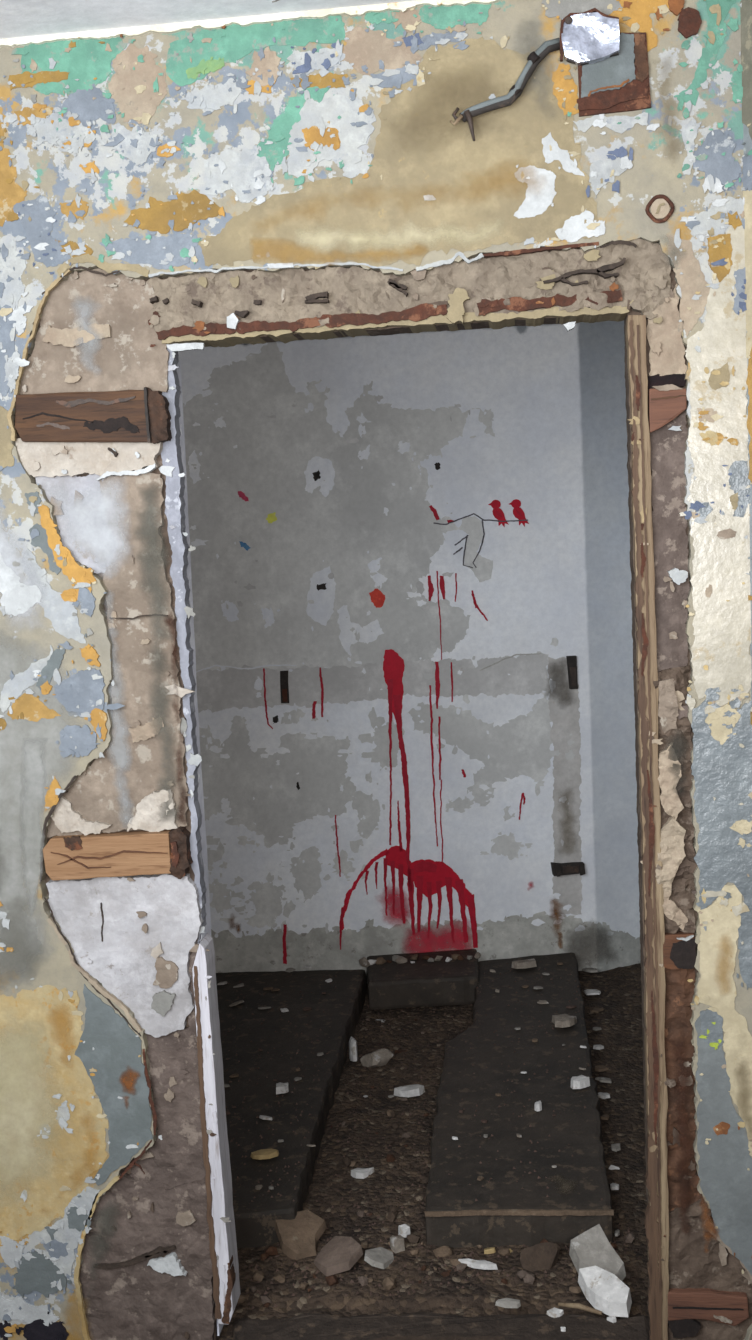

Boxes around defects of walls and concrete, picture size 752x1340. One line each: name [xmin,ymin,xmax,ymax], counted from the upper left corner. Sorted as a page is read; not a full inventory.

peeling [7,34,181,166]
peeling [607,0,702,52]
peeling [674,0,752,140]
peeling [0,115,93,269]
corrosion [148,303,448,347]
peeling [0,641,108,758]
peeling [221,769,284,835]
peeling [358,707,400,771]
peeling [402,651,589,863]
peeling [209,842,463,984]
peeling [465,874,640,973]
crack [93,1245,176,1269]